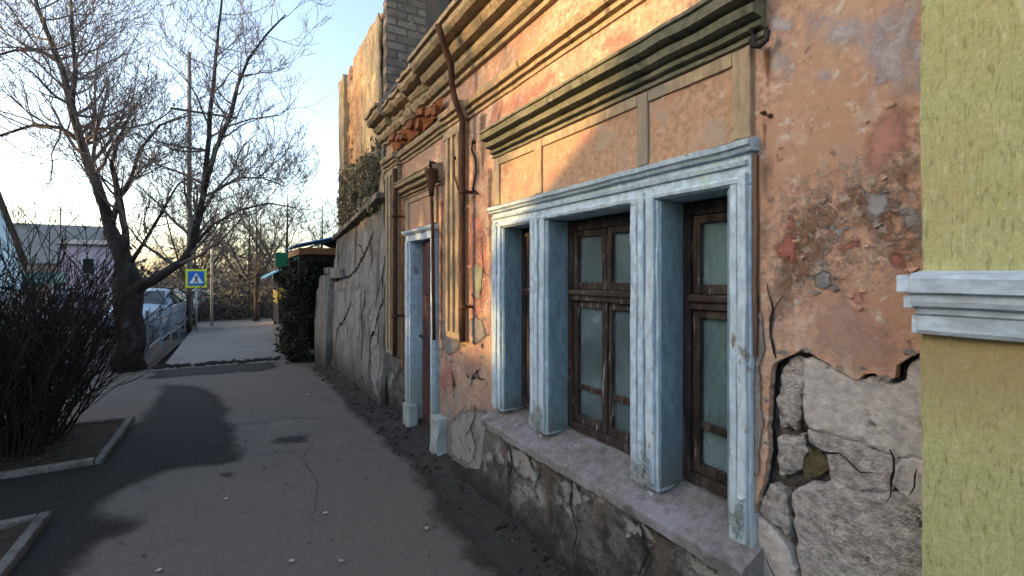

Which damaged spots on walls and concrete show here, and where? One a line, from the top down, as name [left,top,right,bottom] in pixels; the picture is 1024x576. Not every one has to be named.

spalling [389,96,444,152]
peeling [771,143,923,311]
crack [333,232,385,386]
crack [758,284,783,358]
spalling [448,406,488,469]
crack [507,446,523,503]
spalling [727,347,922,576]
crack [569,481,582,557]